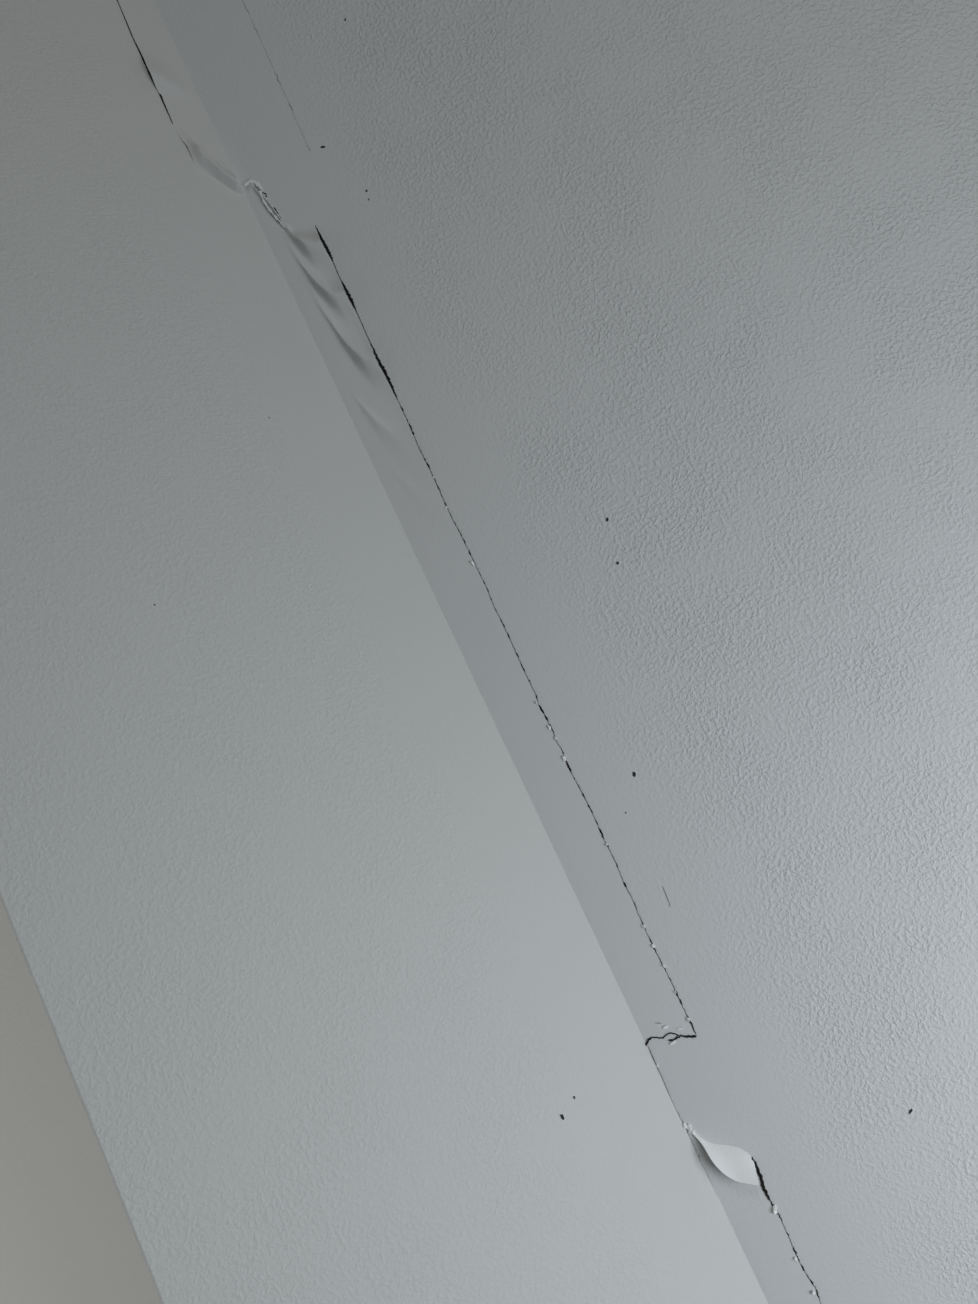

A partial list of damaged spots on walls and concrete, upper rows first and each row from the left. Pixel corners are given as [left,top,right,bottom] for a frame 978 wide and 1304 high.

crack [117,0,188,148]
crack [315,225,716,1193]
crack [752,1157,821,1303]